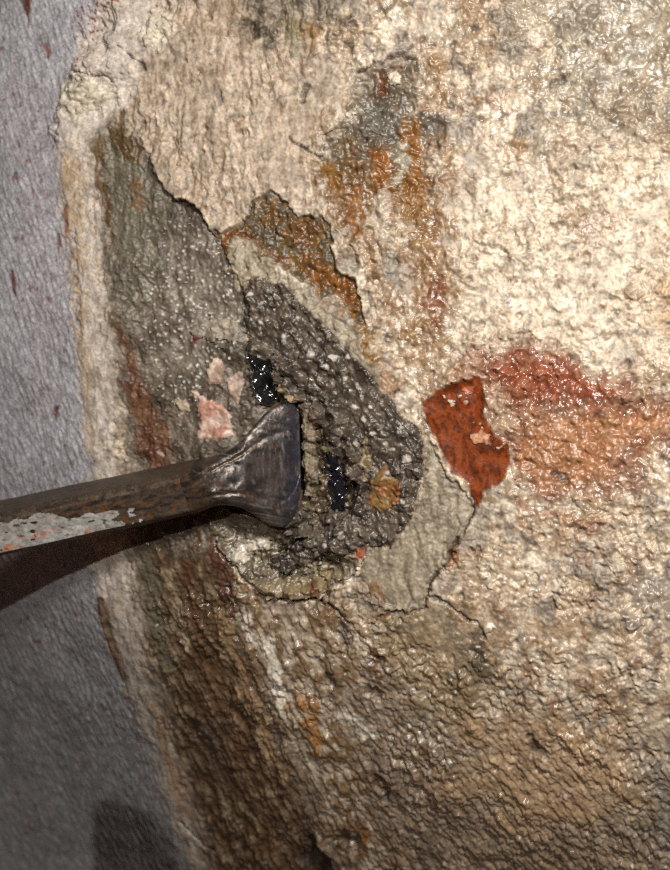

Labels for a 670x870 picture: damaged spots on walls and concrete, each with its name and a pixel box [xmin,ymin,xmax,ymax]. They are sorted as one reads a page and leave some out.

spalling [57,41,465,476]
rust [349,174,475,402]
spalling [0,376,513,623]
water stain [442,326,670,658]
water stain [114,513,670,870]